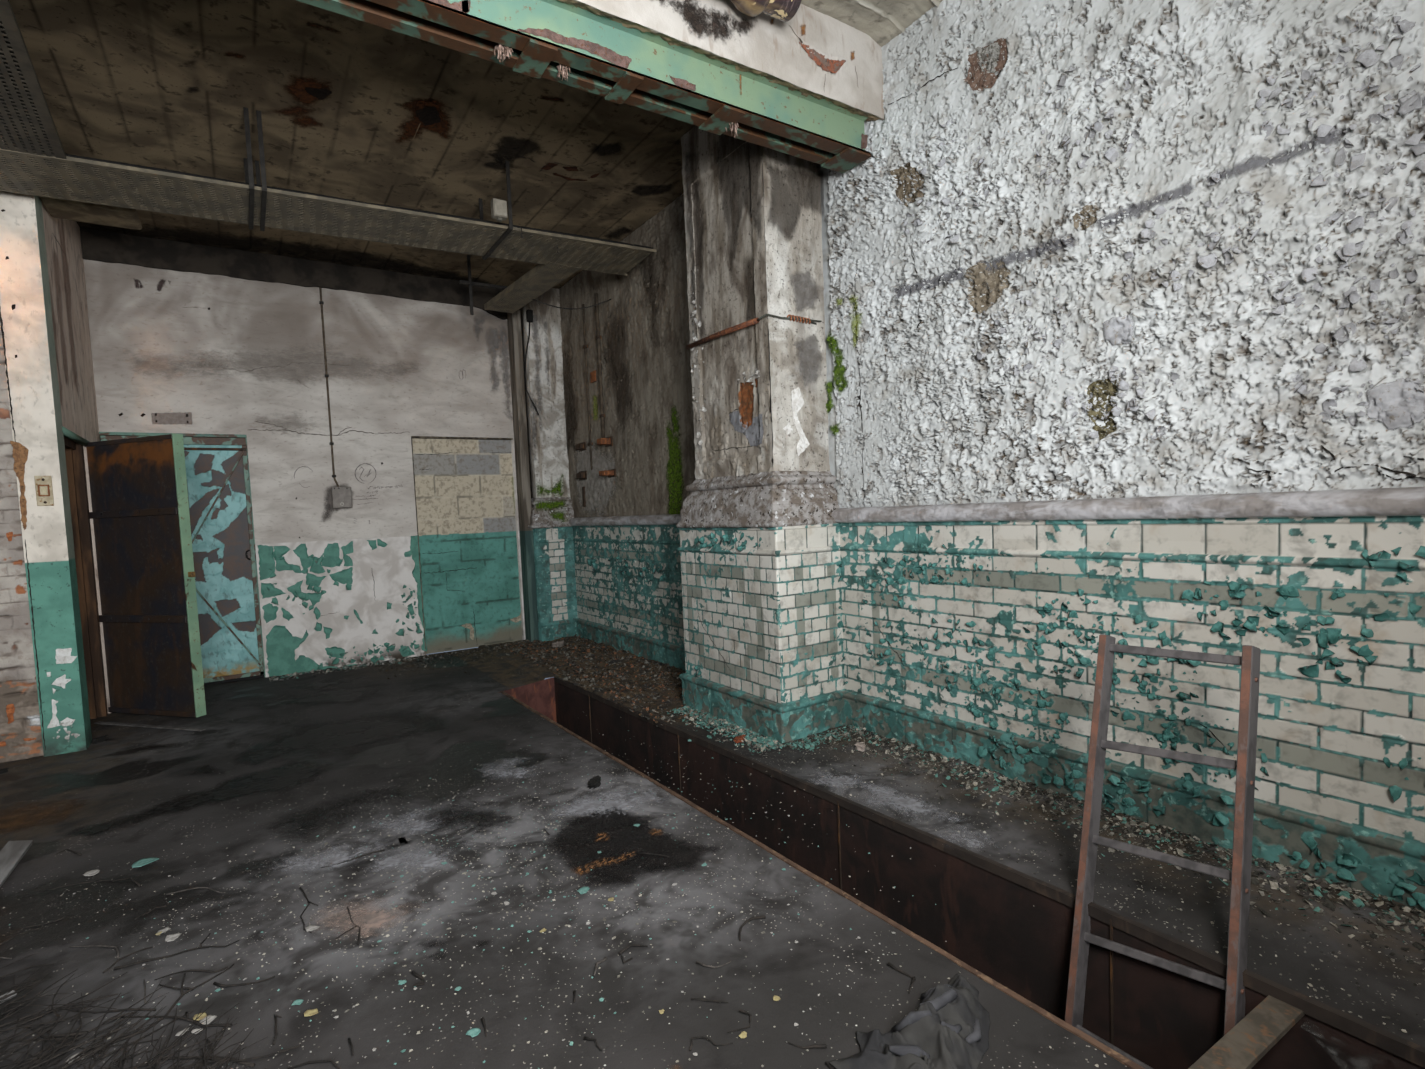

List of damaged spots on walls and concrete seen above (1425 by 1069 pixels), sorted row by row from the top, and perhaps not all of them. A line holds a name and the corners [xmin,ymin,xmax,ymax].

flaking render [964,38,1008,91]
flaking render [890,119,992,254]
flaking render [964,261,1073,376]
flaking render [6,441,29,541]
peeling [23,648,80,741]
peeling [257,535,427,677]
peeling [836,561,848,686]
peeling [862,543,1236,827]
peeling [1181,581,1390,684]
peeling [1361,546,1425,585]
spalling [500,677,1425,1069]